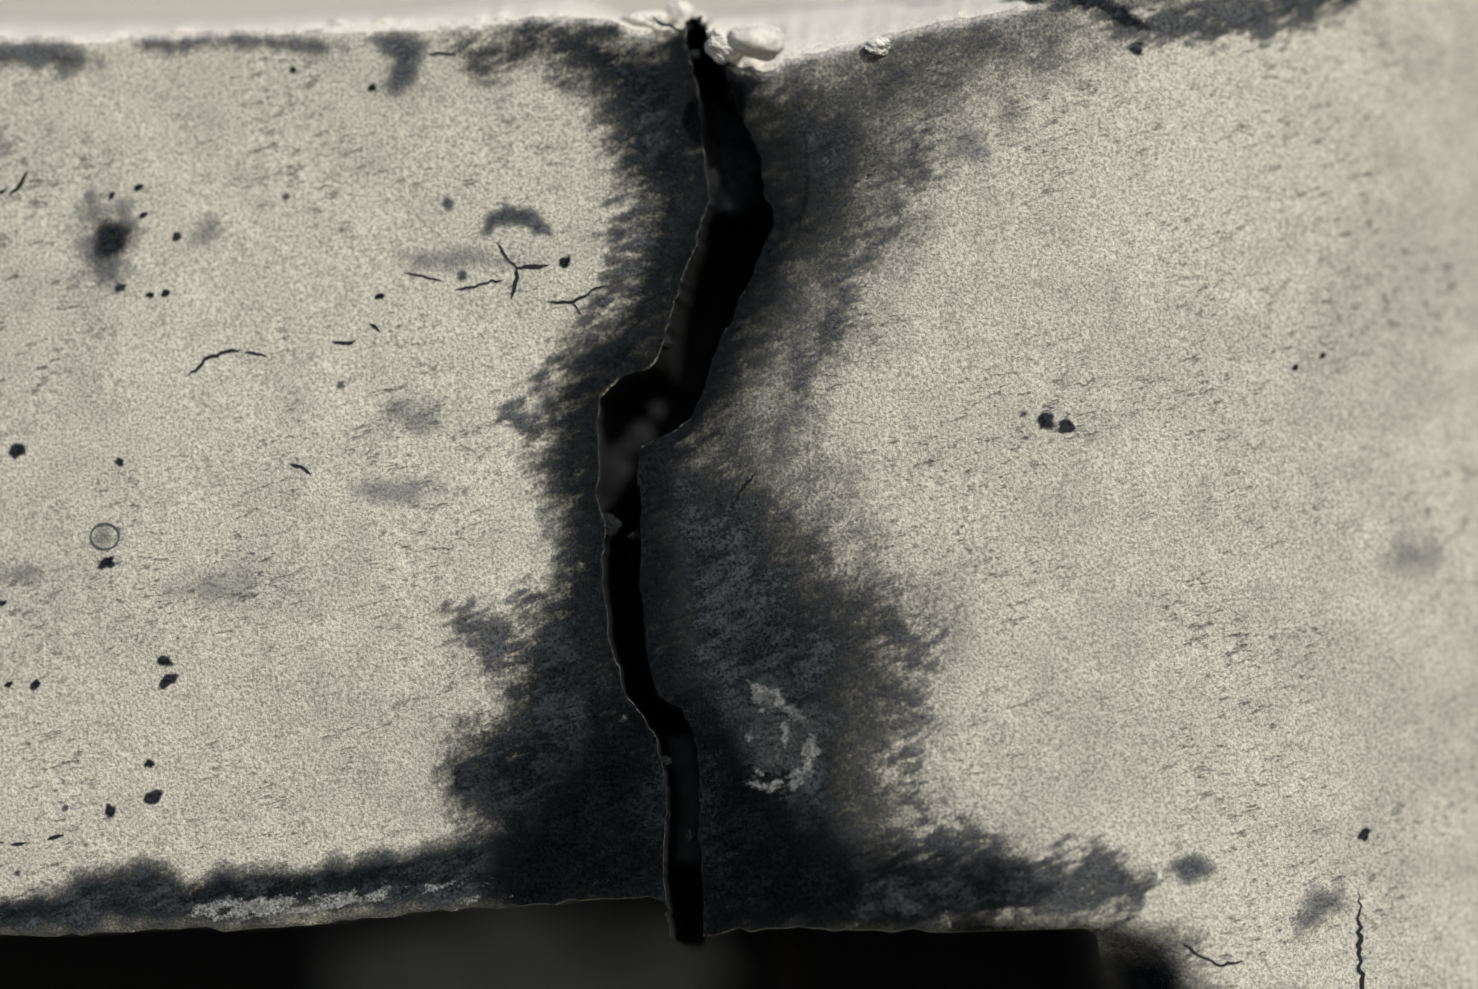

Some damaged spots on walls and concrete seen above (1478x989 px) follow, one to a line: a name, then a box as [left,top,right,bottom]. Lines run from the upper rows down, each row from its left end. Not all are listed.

water stain [0,37,103,78]
water stain [143,30,329,53]
water stain [190,16,710,908]
crack [596,15,808,949]
water stain [637,7,1077,935]
water stain [0,897,49,927]
water stain [1097,920,1219,989]
crack [1356,888,1366,989]